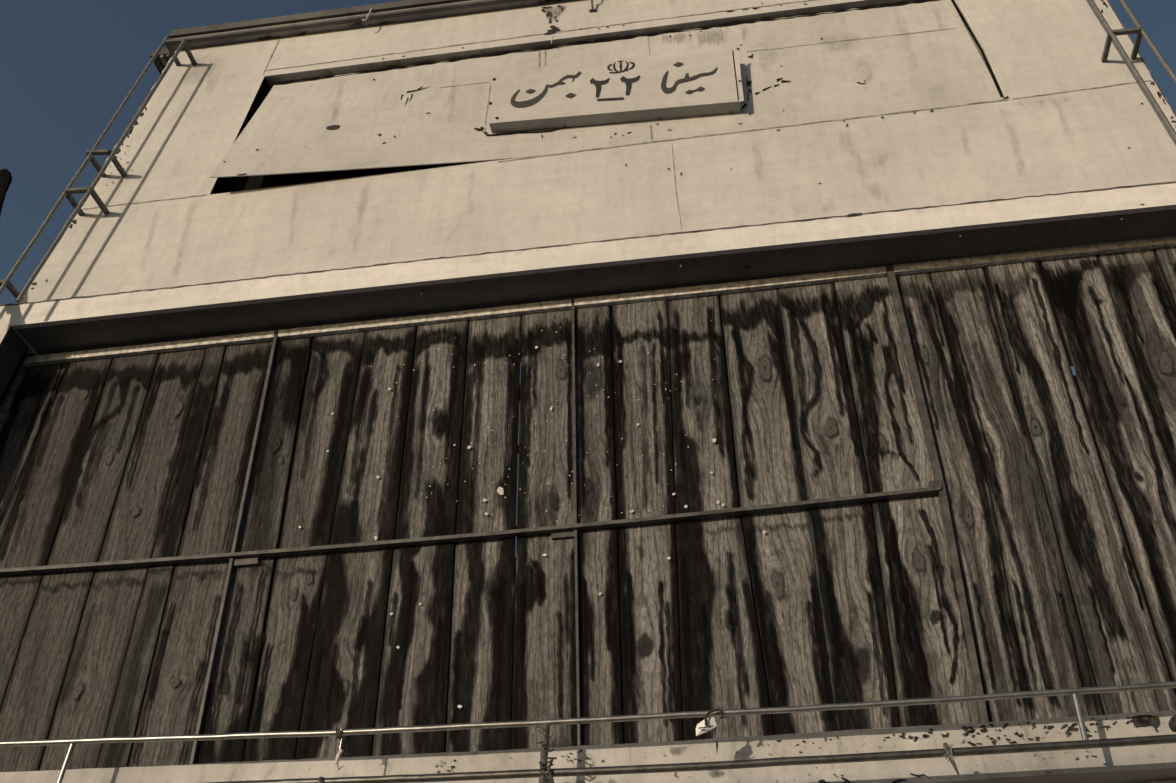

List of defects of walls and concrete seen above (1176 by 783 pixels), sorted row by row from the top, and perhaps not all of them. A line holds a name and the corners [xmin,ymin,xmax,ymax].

water stain [0,255,1176,768]
peeling [883,715,1176,756]